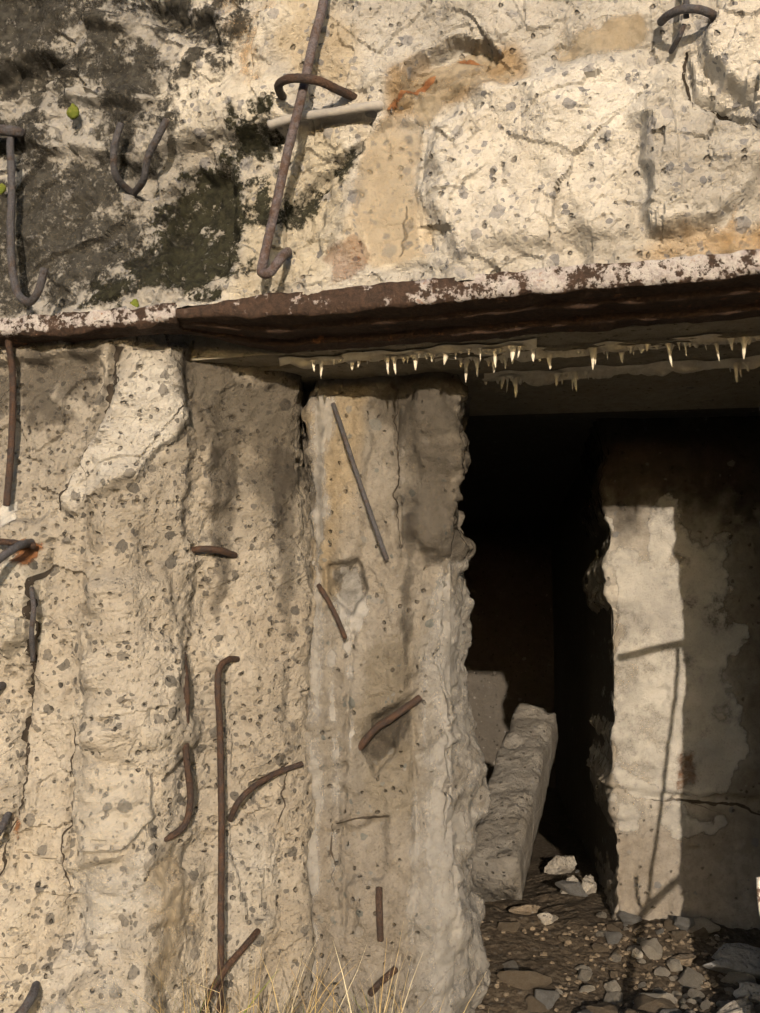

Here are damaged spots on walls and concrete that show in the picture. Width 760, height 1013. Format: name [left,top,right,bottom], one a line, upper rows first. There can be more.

leakage [26,89,47,120]
leakage [173,46,205,96]
spalling [387,44,498,111]
crack [682,52,758,128]
leakage [279,334,760,397]
leakage [580,415,760,534]
leakage [307,390,369,721]
spalling [365,702,410,760]
leakage [306,742,339,899]